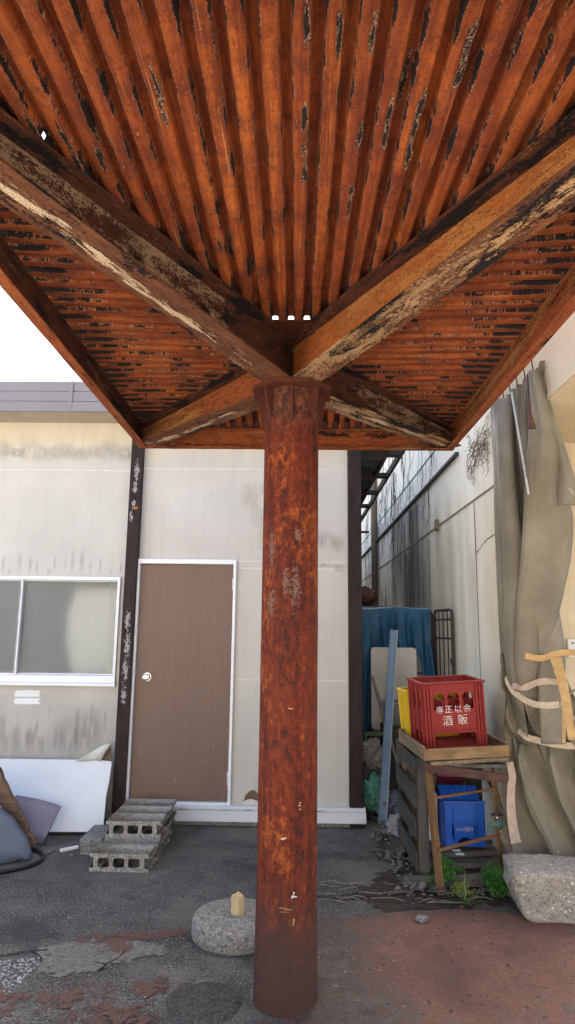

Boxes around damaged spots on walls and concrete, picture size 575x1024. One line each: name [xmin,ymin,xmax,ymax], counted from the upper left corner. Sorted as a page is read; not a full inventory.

rust [303,0,311,51]
rust [336,3,344,61]
rust [453,13,481,88]
rust [301,101,309,184]
rust [381,48,411,151]
rust [404,88,427,171]
peeling [0,175,252,365]
peeling [387,177,575,318]
peeling [333,406,446,446]
peeling [129,459,140,522]
leakage [388,503,437,608]
peeling [121,612,131,704]